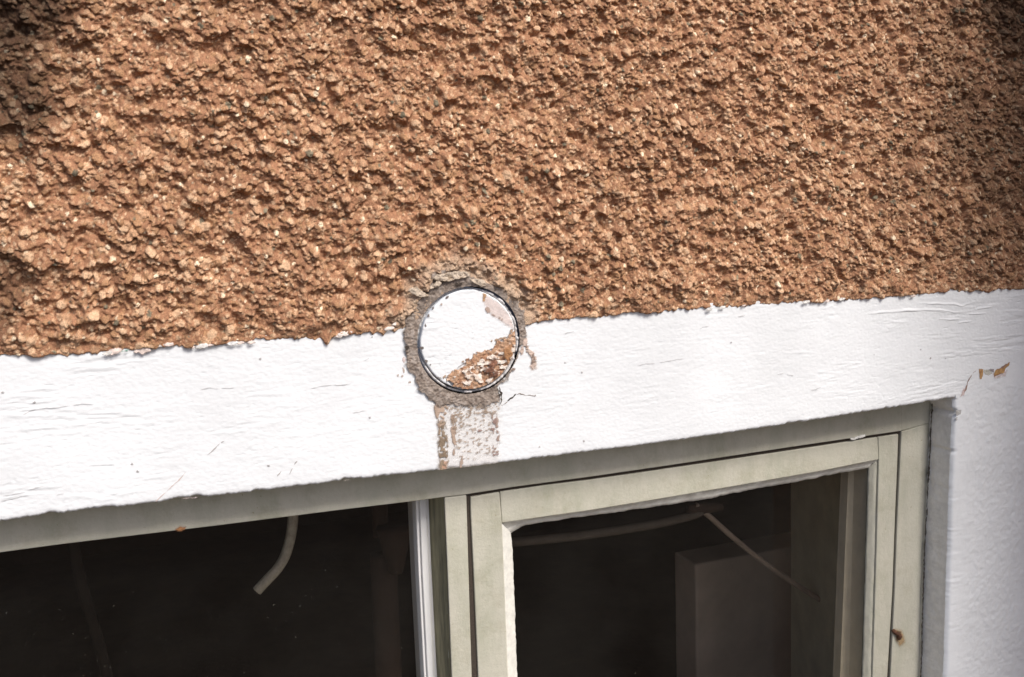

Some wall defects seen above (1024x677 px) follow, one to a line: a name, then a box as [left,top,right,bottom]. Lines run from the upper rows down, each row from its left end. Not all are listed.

spalling [384,269,537,470]
peeling [979,362,1010,379]